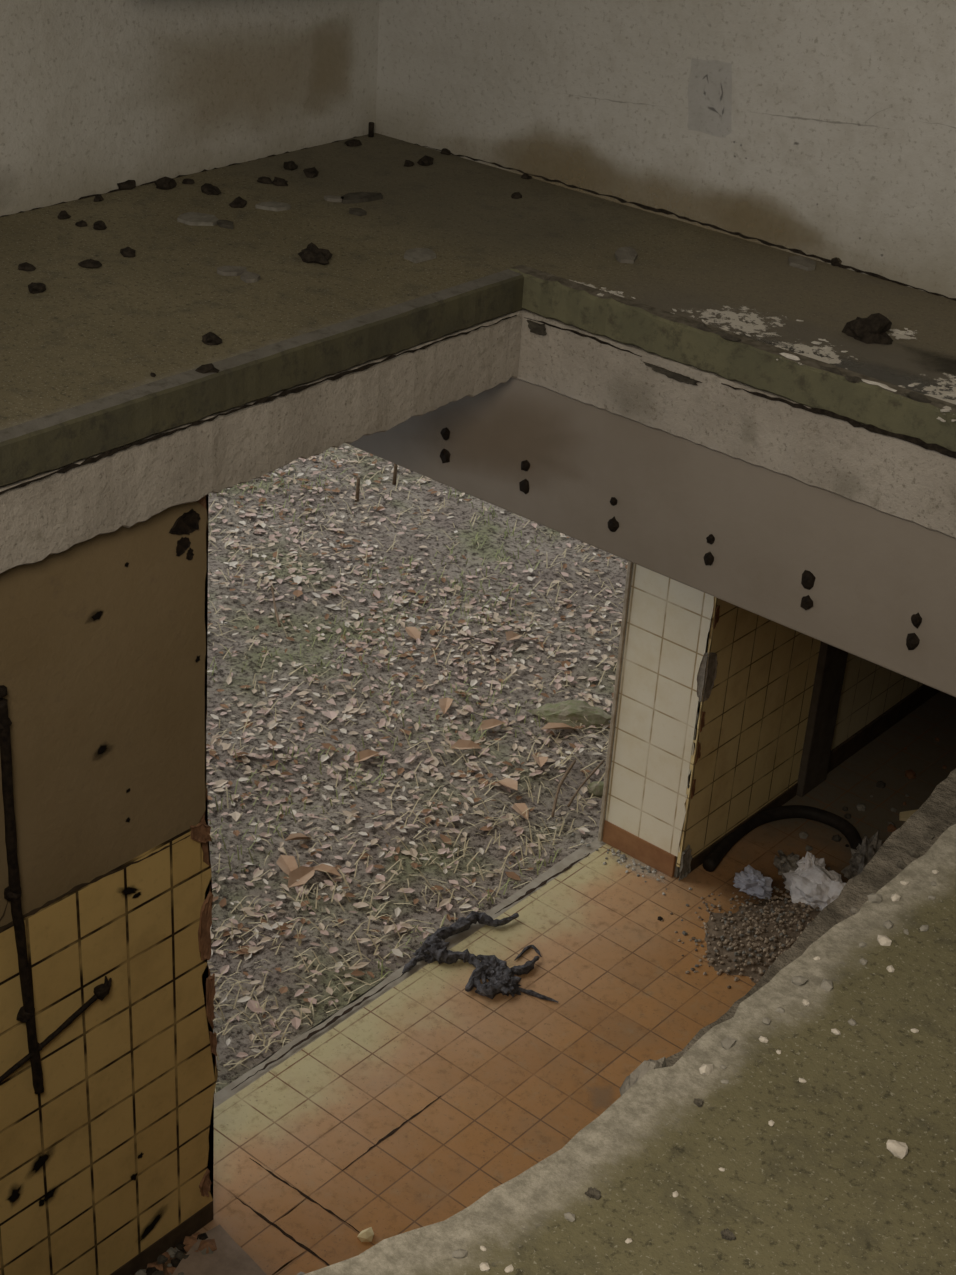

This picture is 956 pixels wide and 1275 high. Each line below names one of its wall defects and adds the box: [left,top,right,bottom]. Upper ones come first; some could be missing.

leakage [525,139,786,239]
spalling [526,320,547,336]
spalling [642,361,703,385]
peeling [670,306,956,422]
crack [342,1096,441,1171]
crack [234,1158,360,1274]